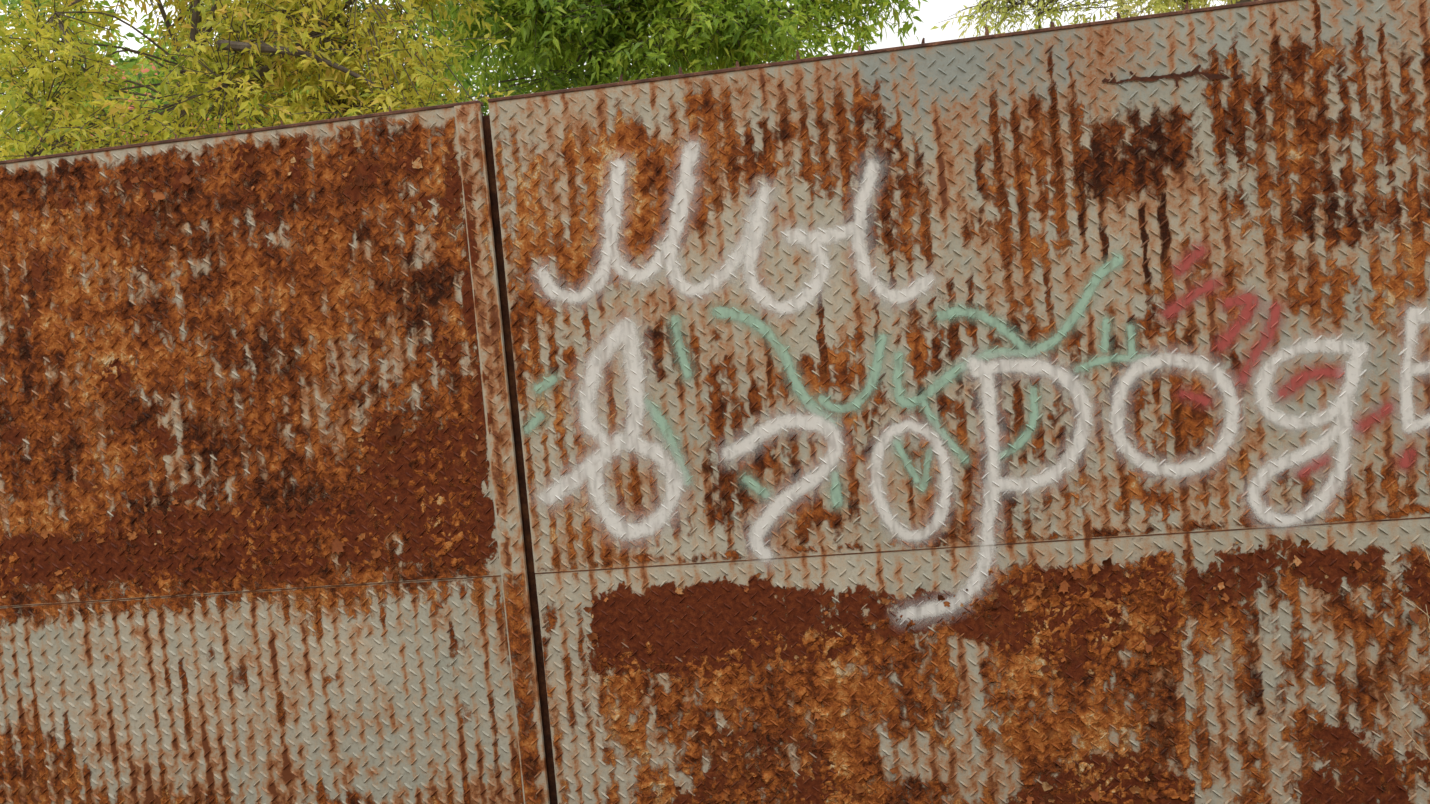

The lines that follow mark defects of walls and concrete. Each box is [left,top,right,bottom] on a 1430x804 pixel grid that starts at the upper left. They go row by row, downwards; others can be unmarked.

corrosion [0,113,994,804]
corrosion [487,51,1267,580]
corrosion [1192,0,1430,338]
corrosion [1276,443,1430,527]
corrosion [960,545,1430,804]